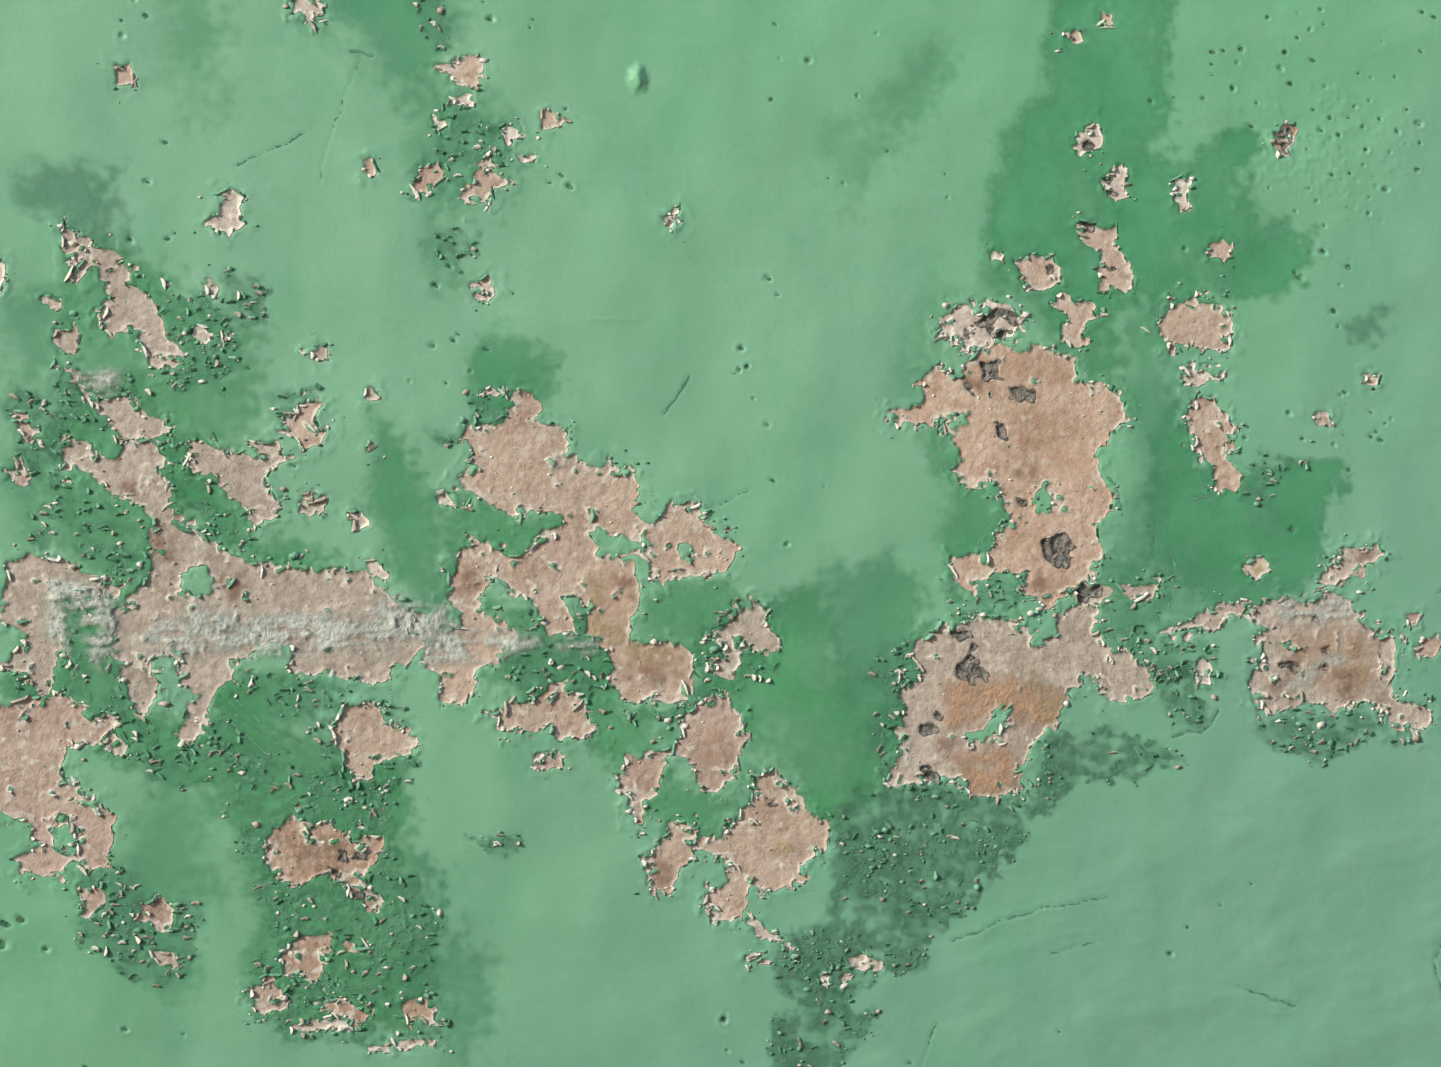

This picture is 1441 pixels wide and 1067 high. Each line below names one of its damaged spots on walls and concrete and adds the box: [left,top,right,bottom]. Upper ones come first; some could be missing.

peeling [282,0,328,33]
peeling [193,182,258,237]
peeling [663,203,685,242]
leakage [989,0,1312,373]
leakage [948,494,1004,558]
leakage [1132,381,1350,607]
peeling [0,216,1441,1067]